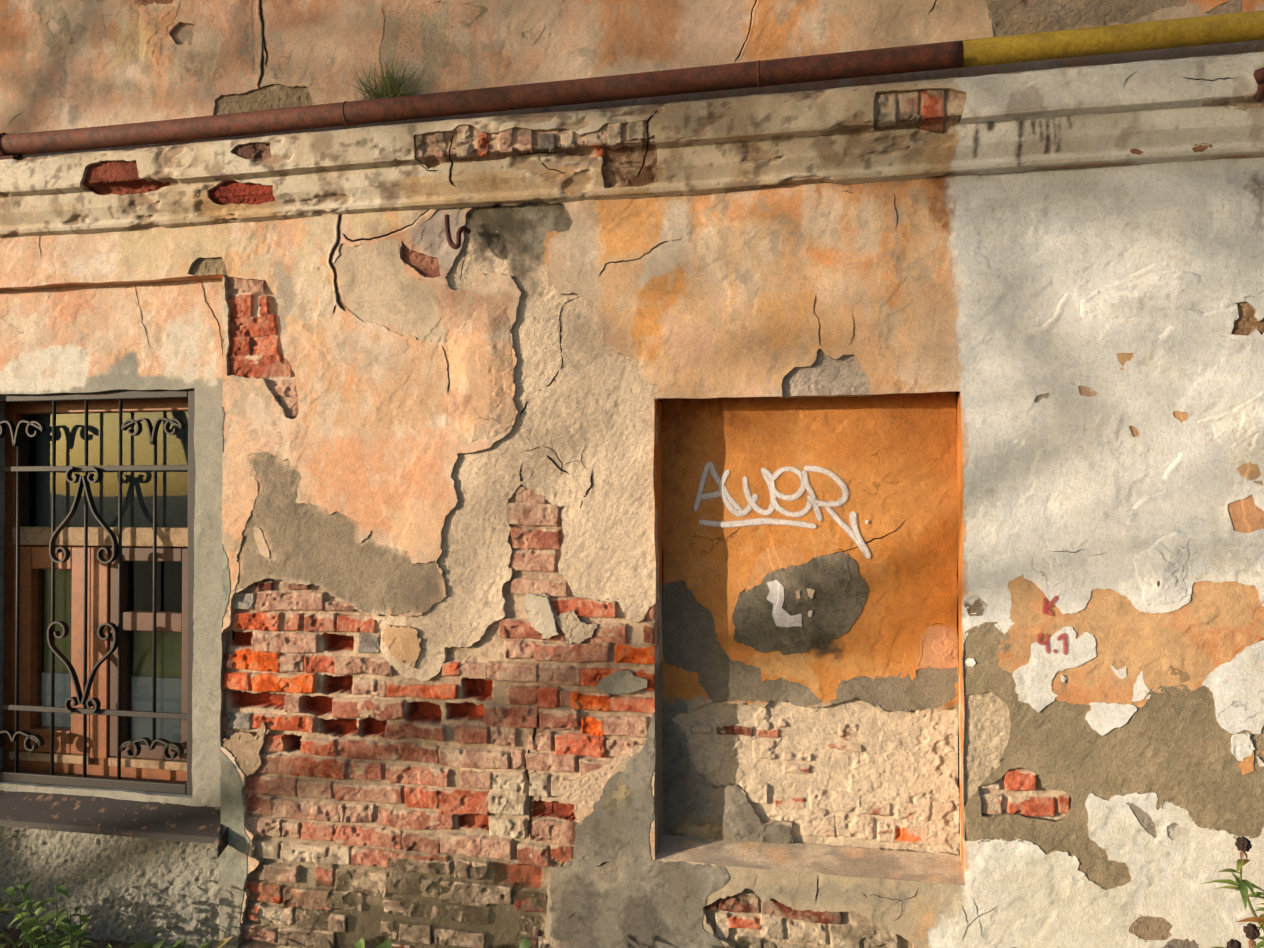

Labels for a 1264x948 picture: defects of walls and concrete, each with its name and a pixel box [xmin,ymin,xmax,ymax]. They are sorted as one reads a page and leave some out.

crack [255,0,268,89]
crack [734,0,761,63]
flaking render [987,0,1186,37]
flaking render [1206,0,1243,15]
spalling [415,121,659,188]
spalling [209,181,275,205]
crack [327,134,455,313]
flaking render [189,258,299,419]
flaking render [222,202,1264,948]